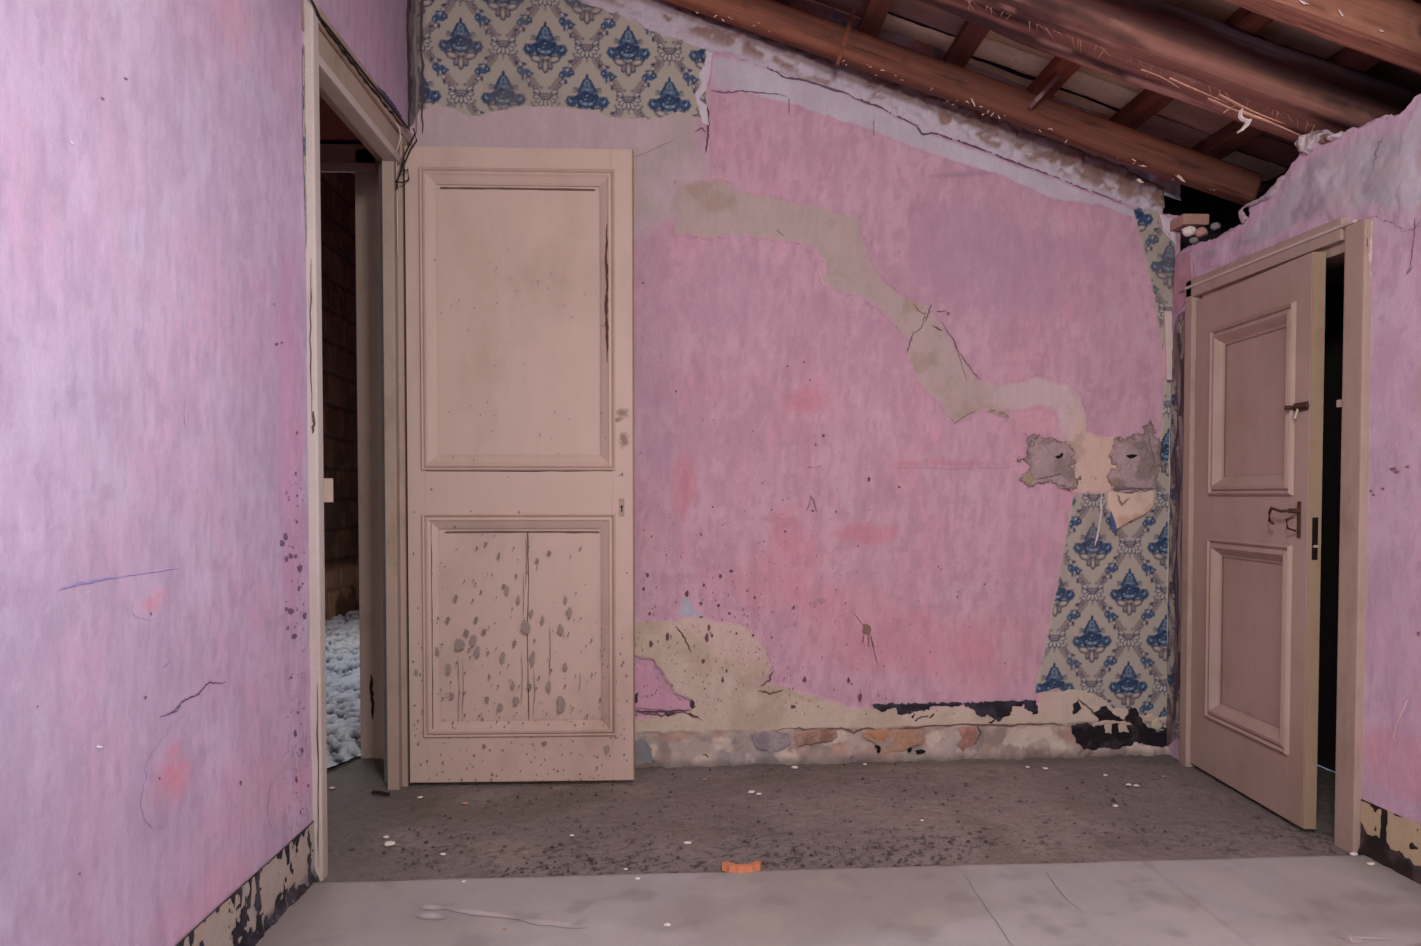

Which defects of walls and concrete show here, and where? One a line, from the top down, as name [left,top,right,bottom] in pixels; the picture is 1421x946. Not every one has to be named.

spalling [580,0,1209,231]
spalling [1294,130,1344,154]
spalling [1238,175,1286,223]
spalling [1017,433,1082,492]
spalling [1106,420,1162,492]
crack [164,681,225,716]
spalling [635,596,1170,768]
peeling [1358,799,1421,885]
peeling [176,821,319,946]